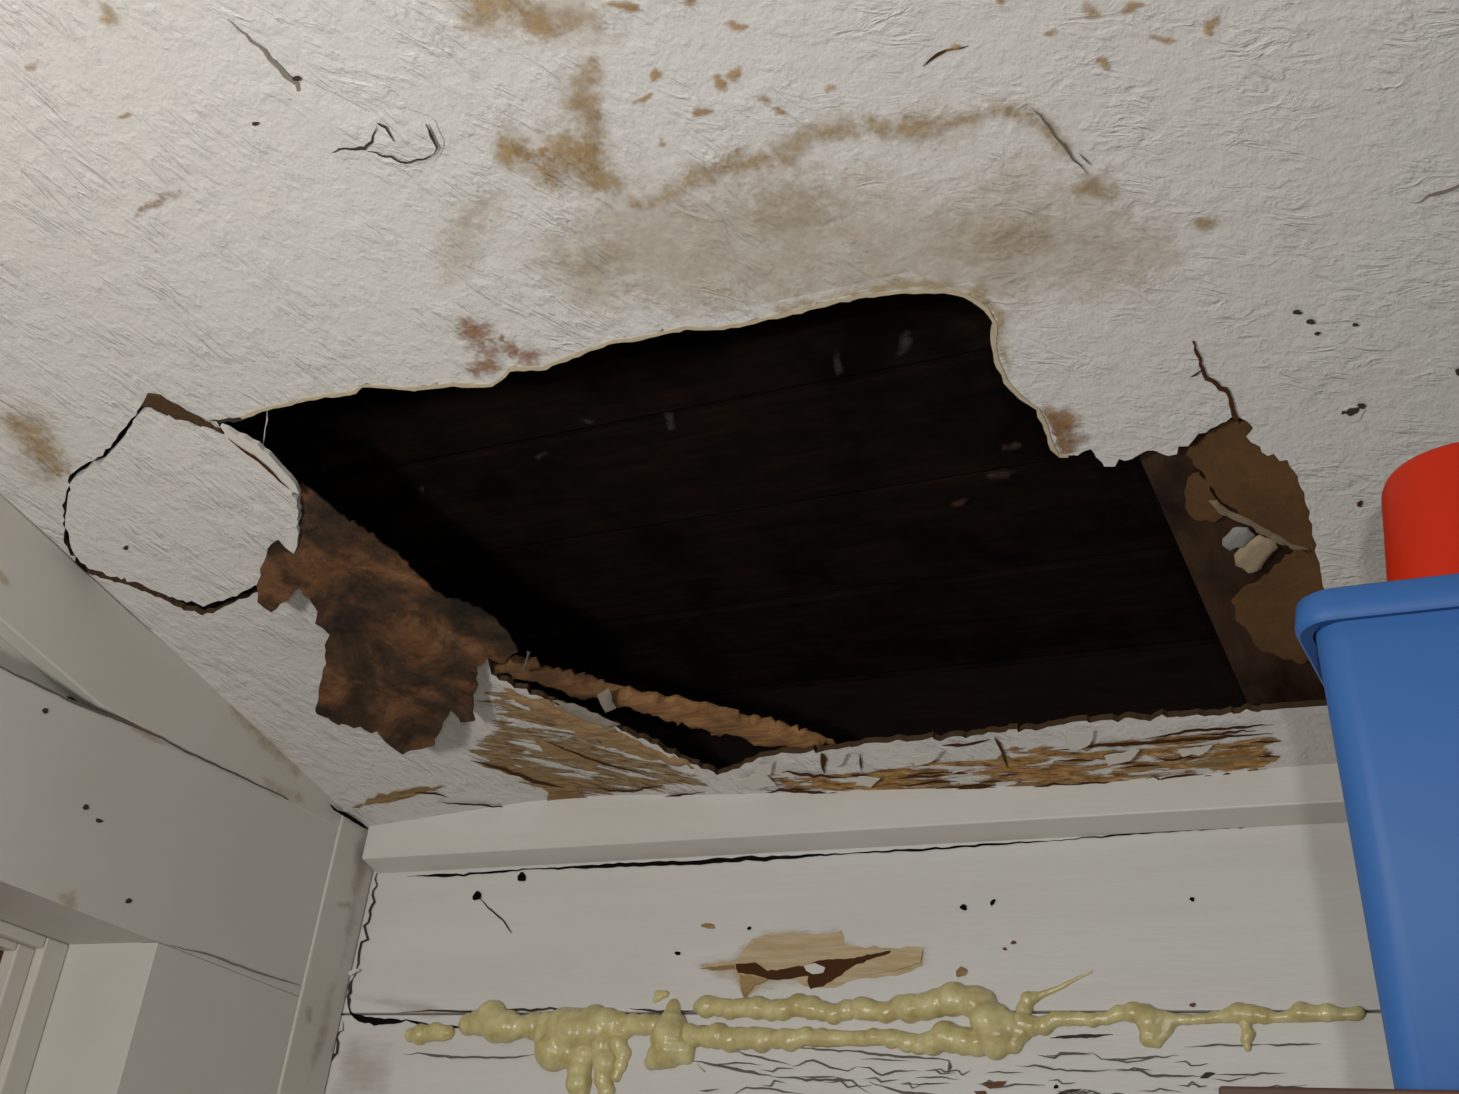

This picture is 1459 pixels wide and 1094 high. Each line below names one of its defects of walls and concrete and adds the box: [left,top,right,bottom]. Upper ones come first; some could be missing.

crack [332,123,438,164]
crack [1414,184,1459,204]
spalling [240,289,1069,458]
crack [1191,340,1239,421]
flaking render [142,393,224,434]
flaking render [1184,418,1324,664]
peeling [467,688,708,801]
peeling [738,724,1281,794]
peeling [352,786,502,808]
peeling [699,965,767,997]
peeling [804,963,825,974]
crack [694,1034,1320,1094]